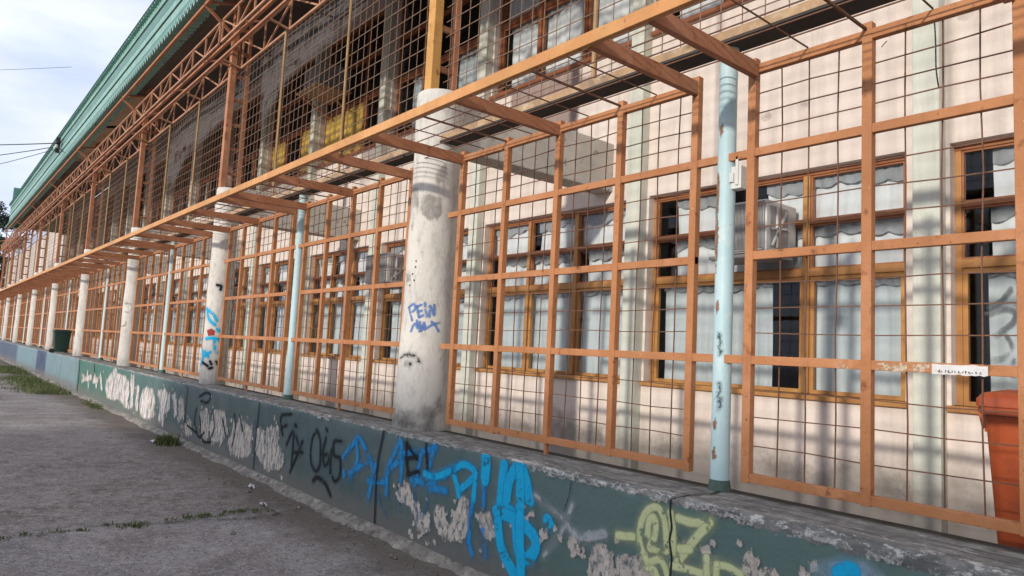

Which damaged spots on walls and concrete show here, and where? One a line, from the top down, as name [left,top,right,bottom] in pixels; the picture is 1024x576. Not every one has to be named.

peeling [393,480,495,553]
crack [668,491,720,576]
peeling [699,539,716,574]
peeling [736,539,781,576]
peeling [798,560,819,576]
spalling [792,530,903,566]